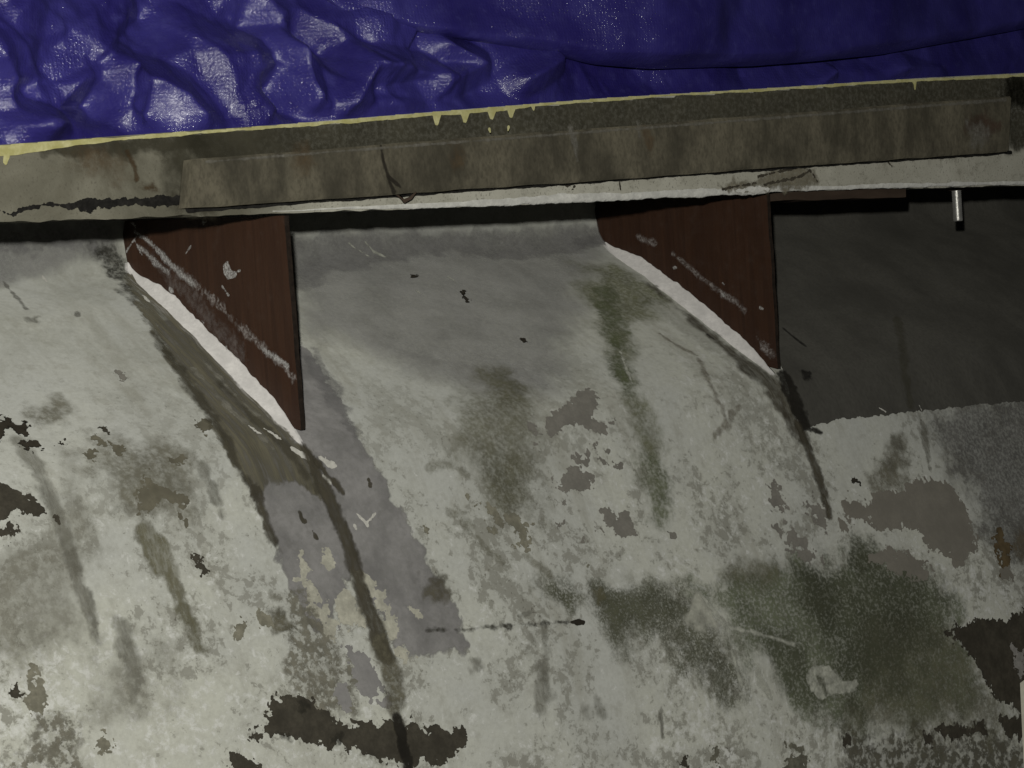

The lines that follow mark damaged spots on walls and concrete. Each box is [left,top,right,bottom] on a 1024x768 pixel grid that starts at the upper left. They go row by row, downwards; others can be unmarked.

crack [3,195,193,217]
peeling [0,482,61,547]
peeling [0,414,66,454]
water stain [82,426,202,651]
water stain [153,334,413,768]
peeling [197,336,470,768]
water stain [639,429,668,524]
peeling [803,474,980,583]
rust [991,527,1024,582]
crack [428,619,585,632]
peeling [8,663,82,768]
peeling [806,607,1024,768]